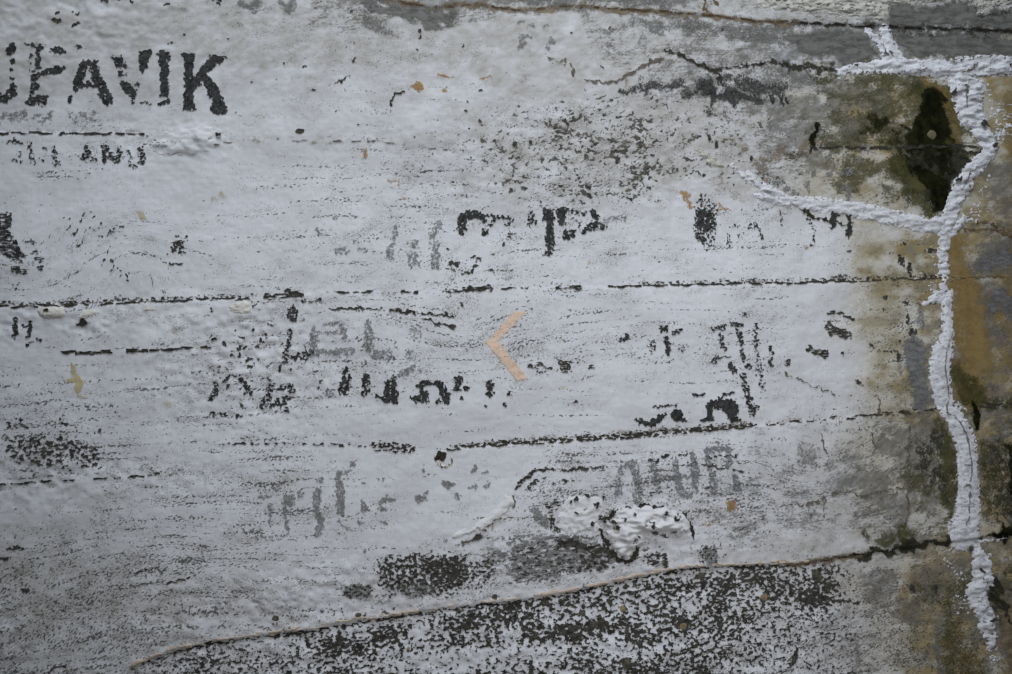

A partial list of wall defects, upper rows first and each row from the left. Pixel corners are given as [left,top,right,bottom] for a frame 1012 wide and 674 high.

peeling [761,152,862,201]
crack [810,142,1012,237]
peeling [441,464,491,499]
spalling [129,499,874,674]